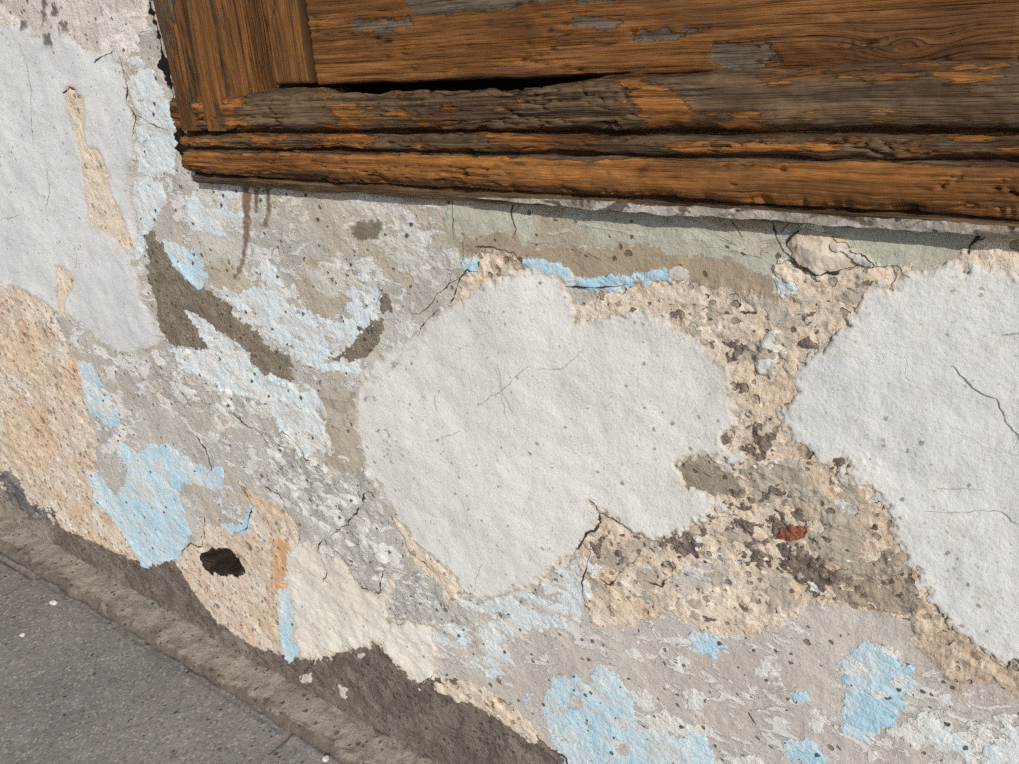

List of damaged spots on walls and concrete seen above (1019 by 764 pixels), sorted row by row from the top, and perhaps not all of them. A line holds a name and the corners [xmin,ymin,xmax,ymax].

damp [234,187,271,278]
flaking render [0,15,566,764]
flaking render [441,197,1019,638]
crack [953,366,1019,437]
flaking render [386,553,1019,764]